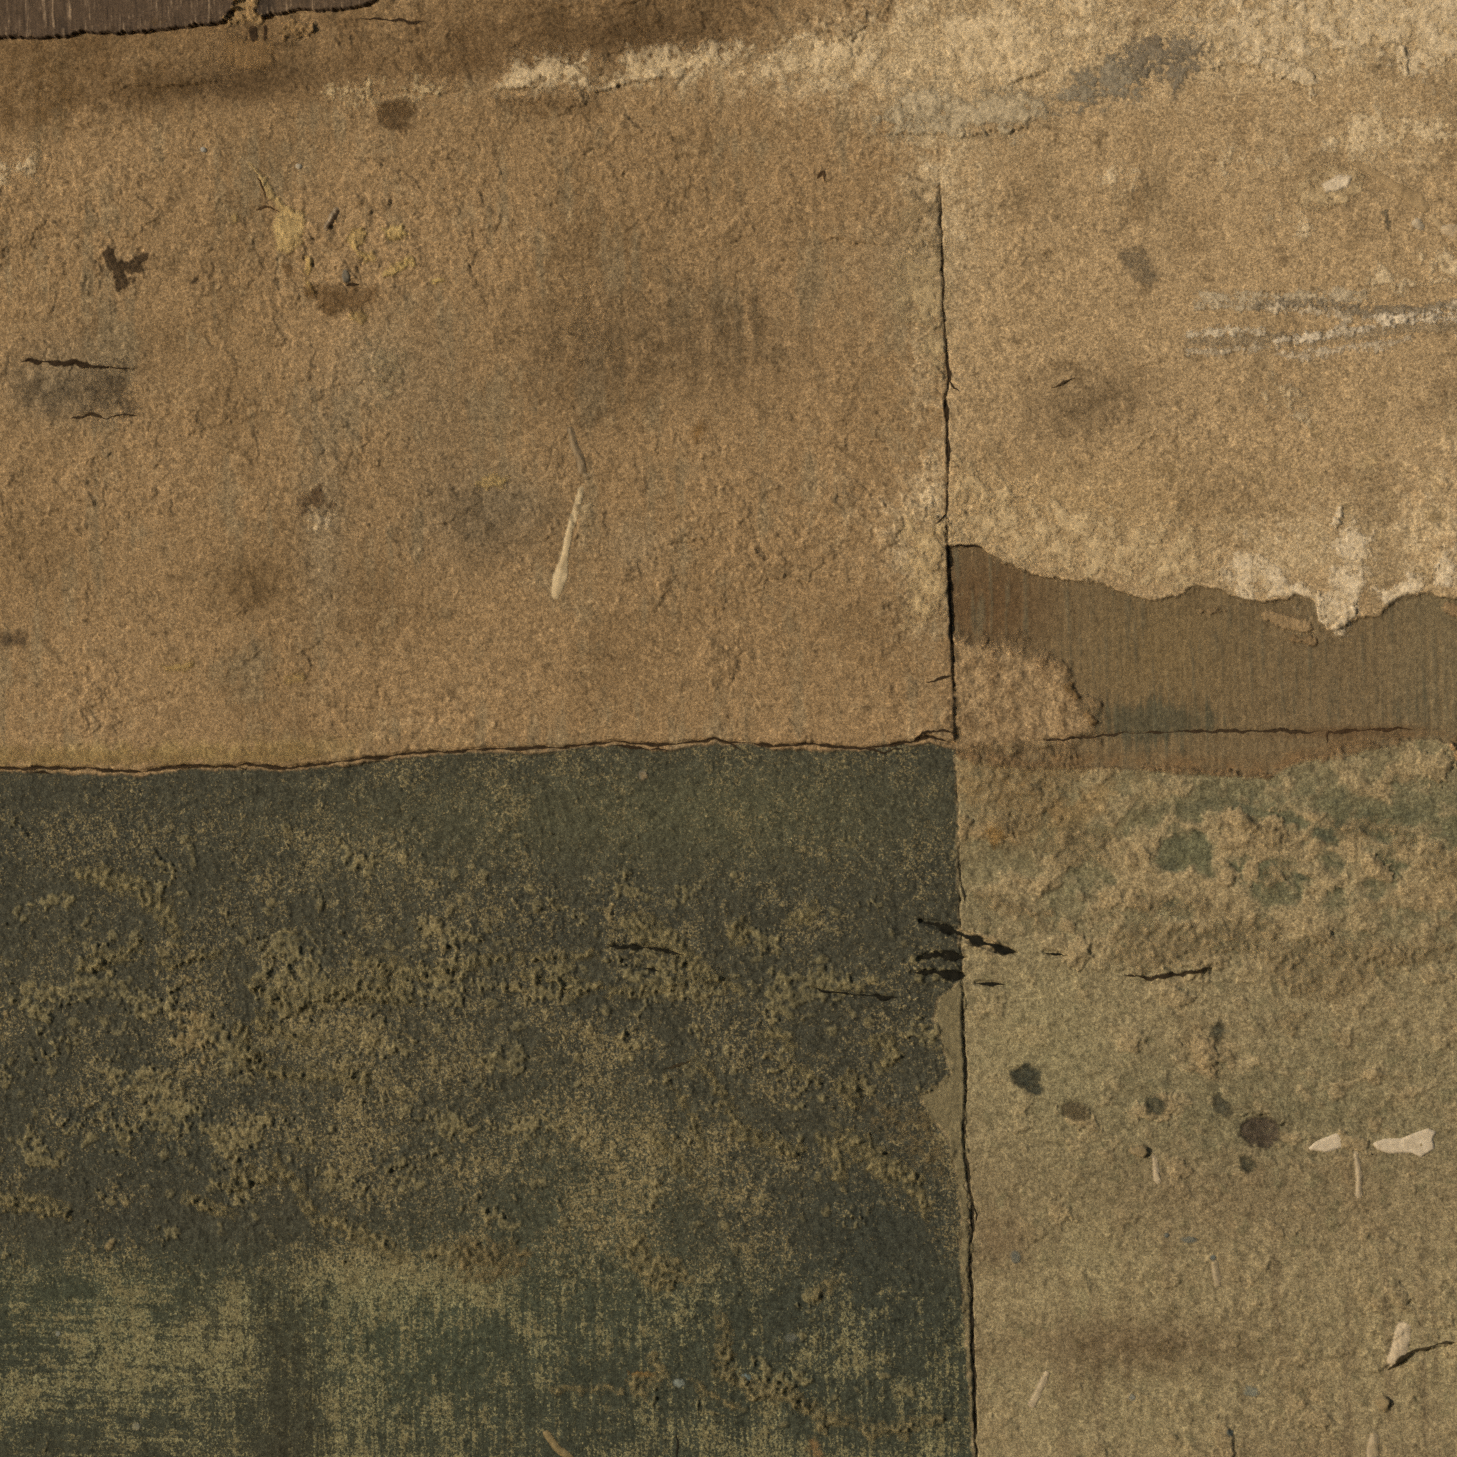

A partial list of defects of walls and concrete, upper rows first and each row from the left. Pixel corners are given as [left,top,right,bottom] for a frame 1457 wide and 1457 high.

crack [21,358,131,370]
crack [72,411,131,419]
crack [926,183,981,686]
spalling [948,545,1457,779]
crack [0,729,953,774]
crack [957,848,965,903]
crack [962,994,978,1457]